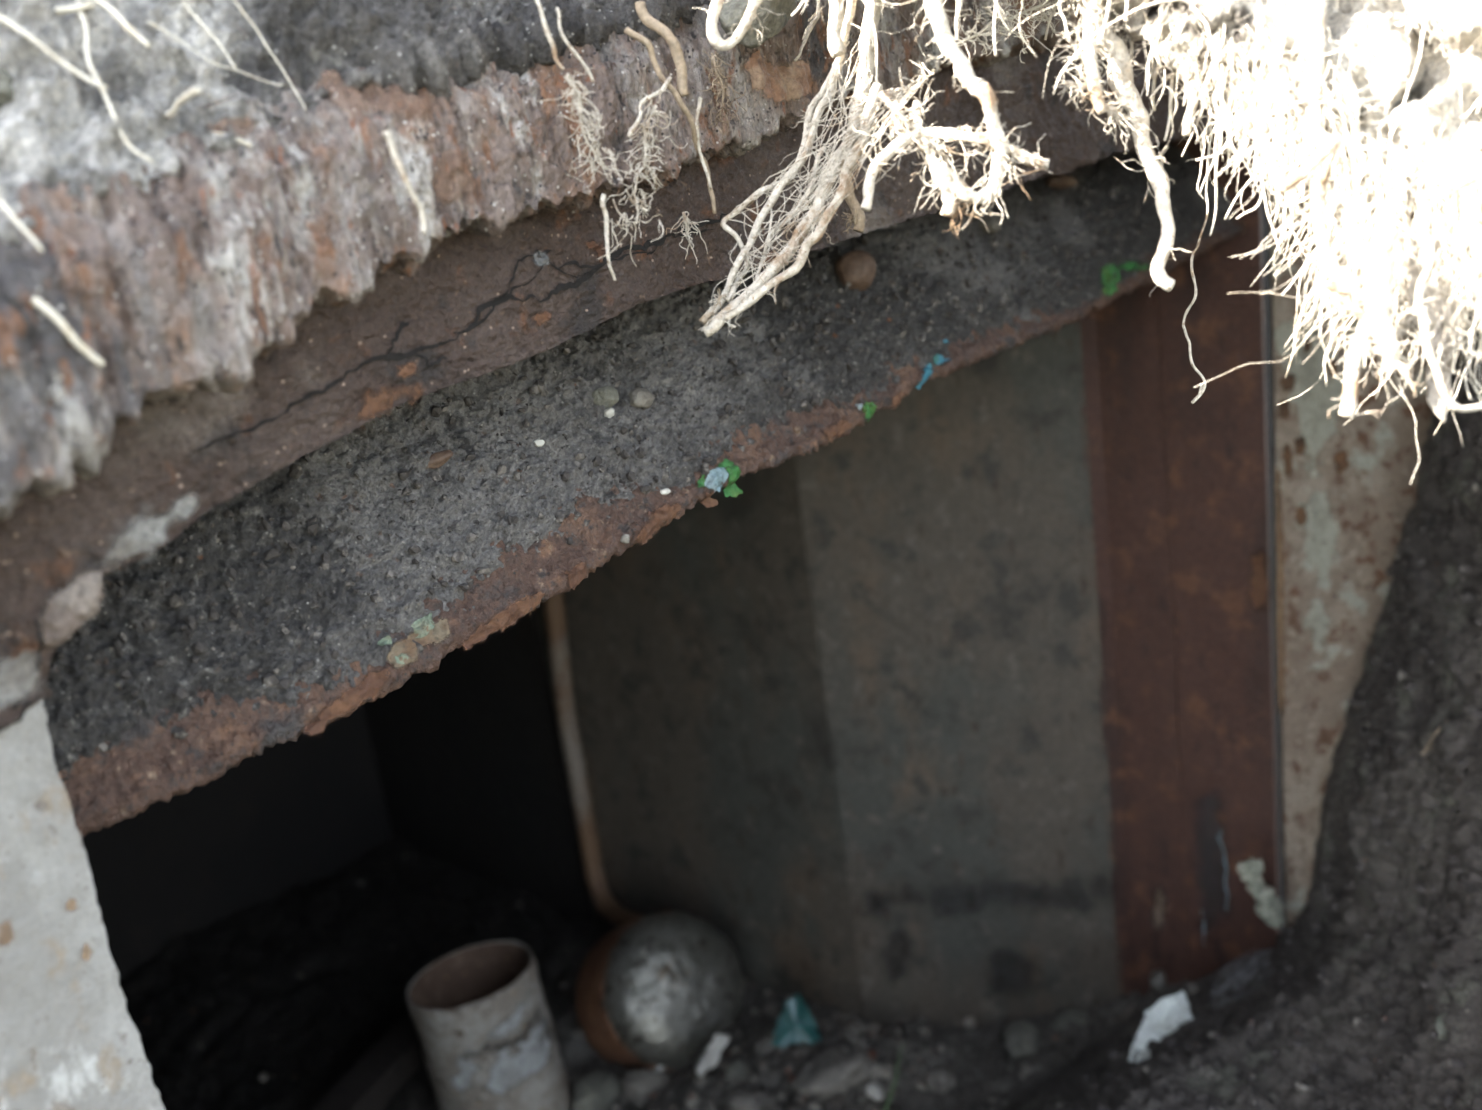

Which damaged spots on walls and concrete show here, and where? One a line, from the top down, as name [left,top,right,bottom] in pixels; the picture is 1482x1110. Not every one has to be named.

corrosion [534,252,549,266]
corrosion [586,240,606,262]
crack [186,213,728,458]
corrosion [359,362,423,420]
peeling [697,459,743,508]
spalling [107,494,197,560]
corrosion [636,502,682,545]
corrosion [564,561,587,590]
peeling [377,612,450,668]
corrosion [461,591,545,650]
spalling [0,652,38,708]
corrosion [304,668,391,736]